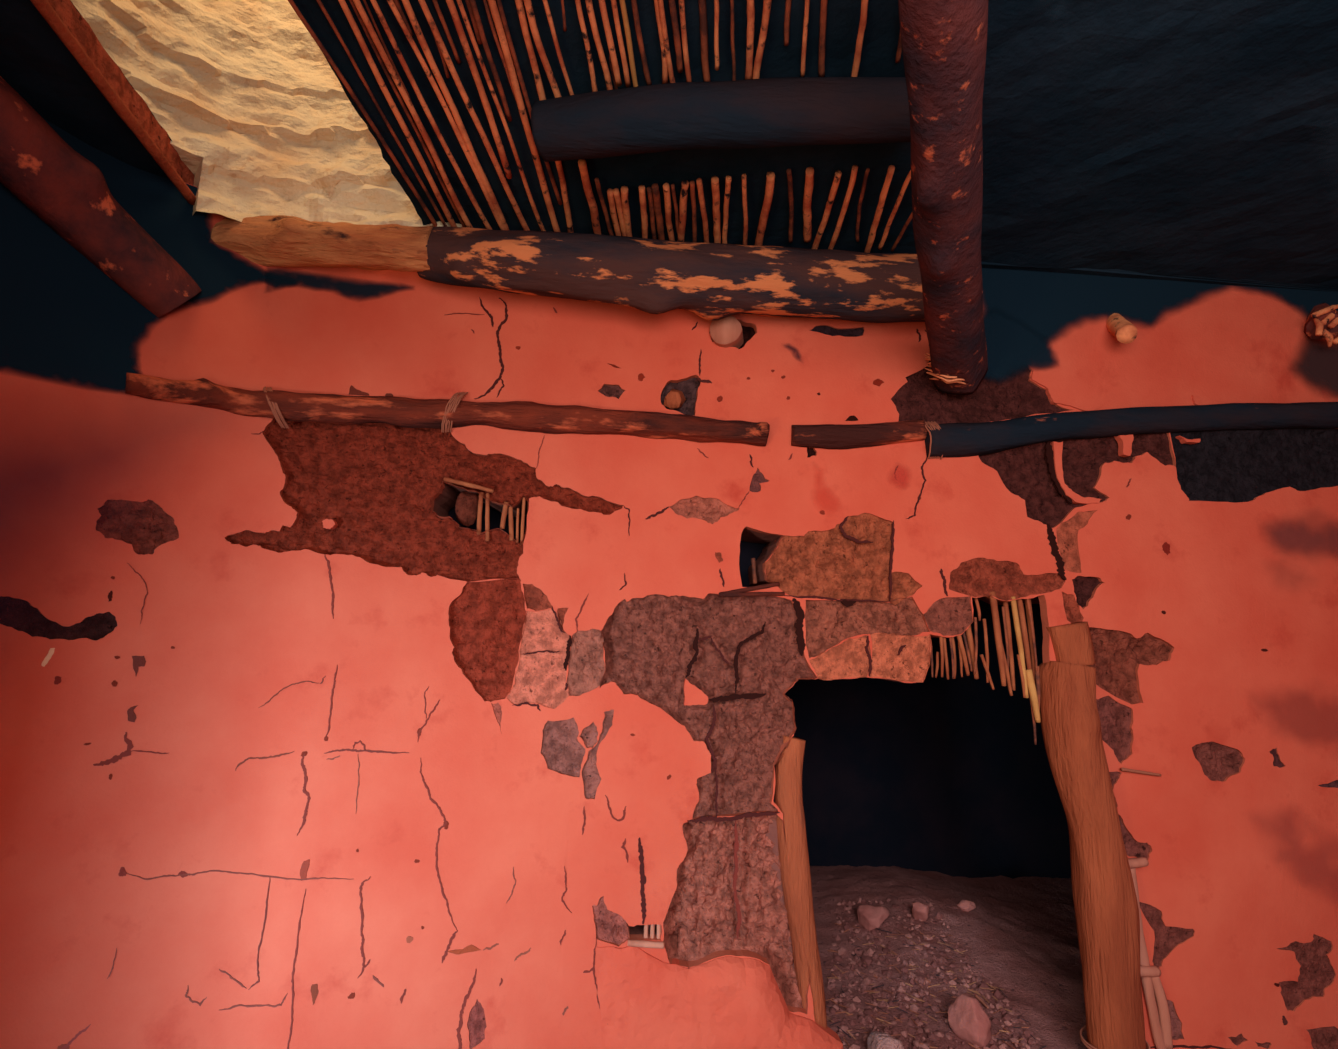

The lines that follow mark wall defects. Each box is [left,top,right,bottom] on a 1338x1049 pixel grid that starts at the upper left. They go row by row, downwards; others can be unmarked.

crack [445,297,508,399]
spalling [891,361,1109,424]
spalling [96,500,179,555]
spalling [0,596,117,640]
crack [324,554,335,619]
spalling [226,419,623,799]
spalling [949,428,1338,787]
crack [93,732,168,766]
crack [235,667,600,1049]
crack [582,795,646,925]
crack [122,870,406,1049]
spalling [1278,934,1335,1011]